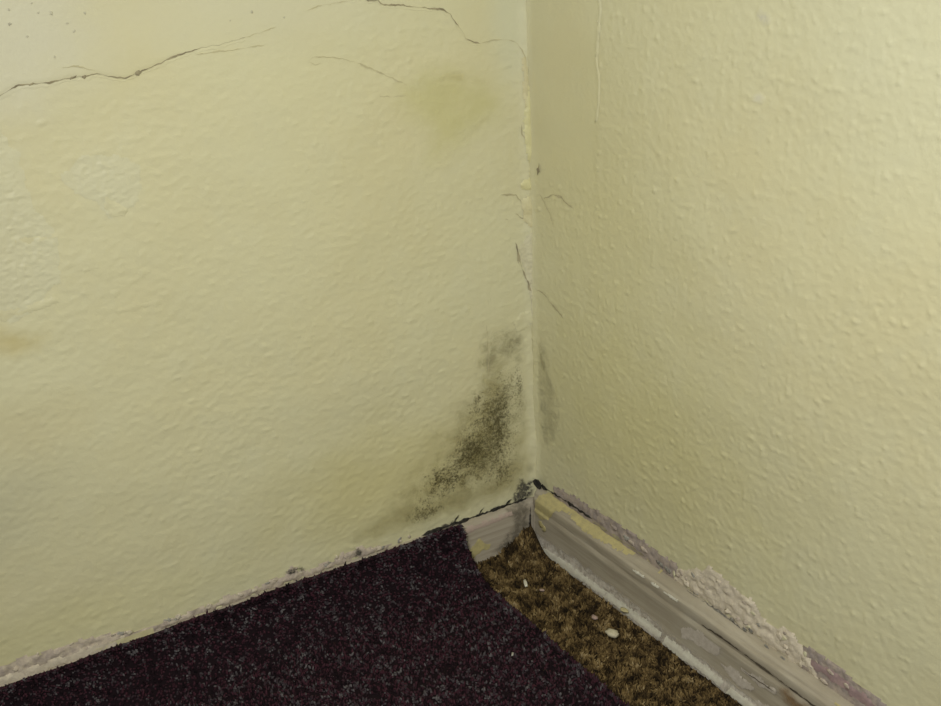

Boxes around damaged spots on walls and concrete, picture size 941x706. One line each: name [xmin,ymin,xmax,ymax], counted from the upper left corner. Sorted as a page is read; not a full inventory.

crack [0,27,275,100]
crack [304,0,526,57]
crack [503,166,572,228]
crack [516,244,562,317]
damp [514,480,532,502]
spalling [534,486,887,706]